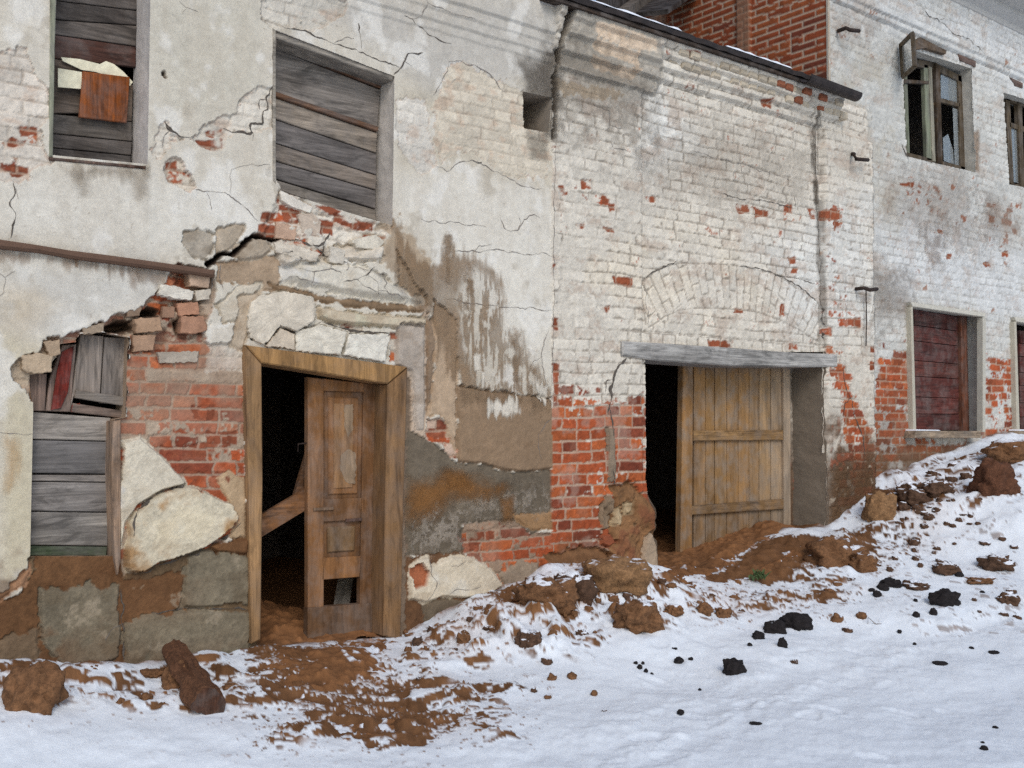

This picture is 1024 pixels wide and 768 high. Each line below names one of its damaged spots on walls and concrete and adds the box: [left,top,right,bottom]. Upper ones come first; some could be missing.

peeling [150,85,272,192]
crack [223,86,273,136]
peeling [395,61,553,181]
crack [9,183,18,236]
crack [195,164,405,303]
crack [422,10,577,458]
water stain [392,222,554,419]
spalling [10,190,393,580]
crack [605,358,627,436]
spalling [837,361,914,471]
spalling [985,360,1012,432]
peeling [404,383,611,604]